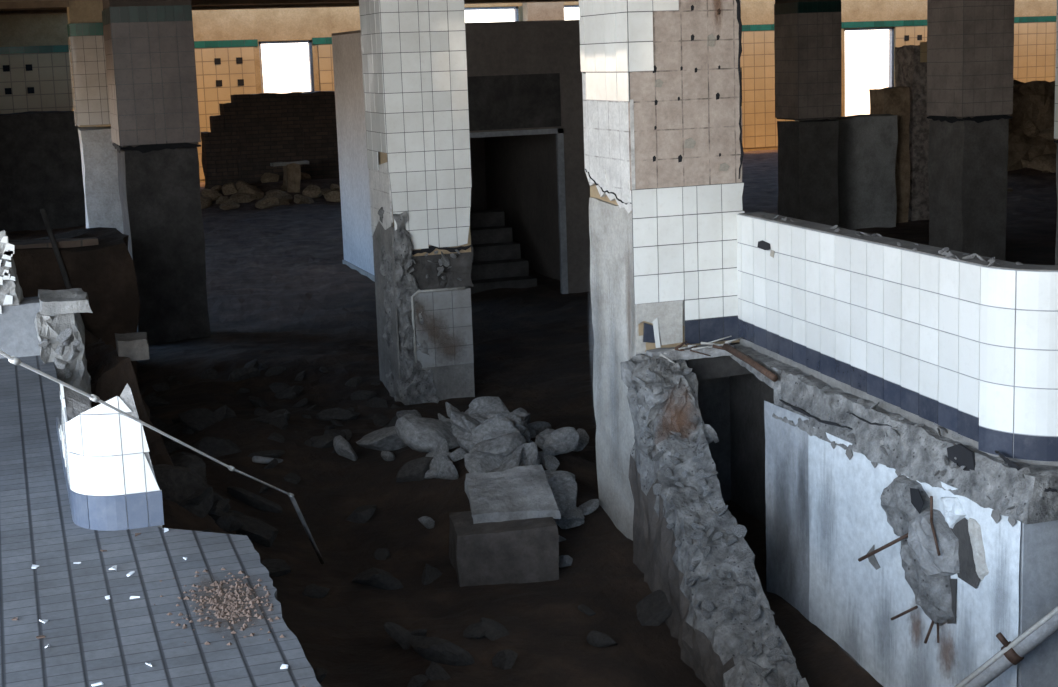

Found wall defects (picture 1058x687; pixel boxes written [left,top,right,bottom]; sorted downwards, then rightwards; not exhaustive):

spalling [582,0,743,214]
crack [736,0,744,179]
spalling [369,162,474,405]
rust [723,343,778,382]
spalling [647,342,1058,644]